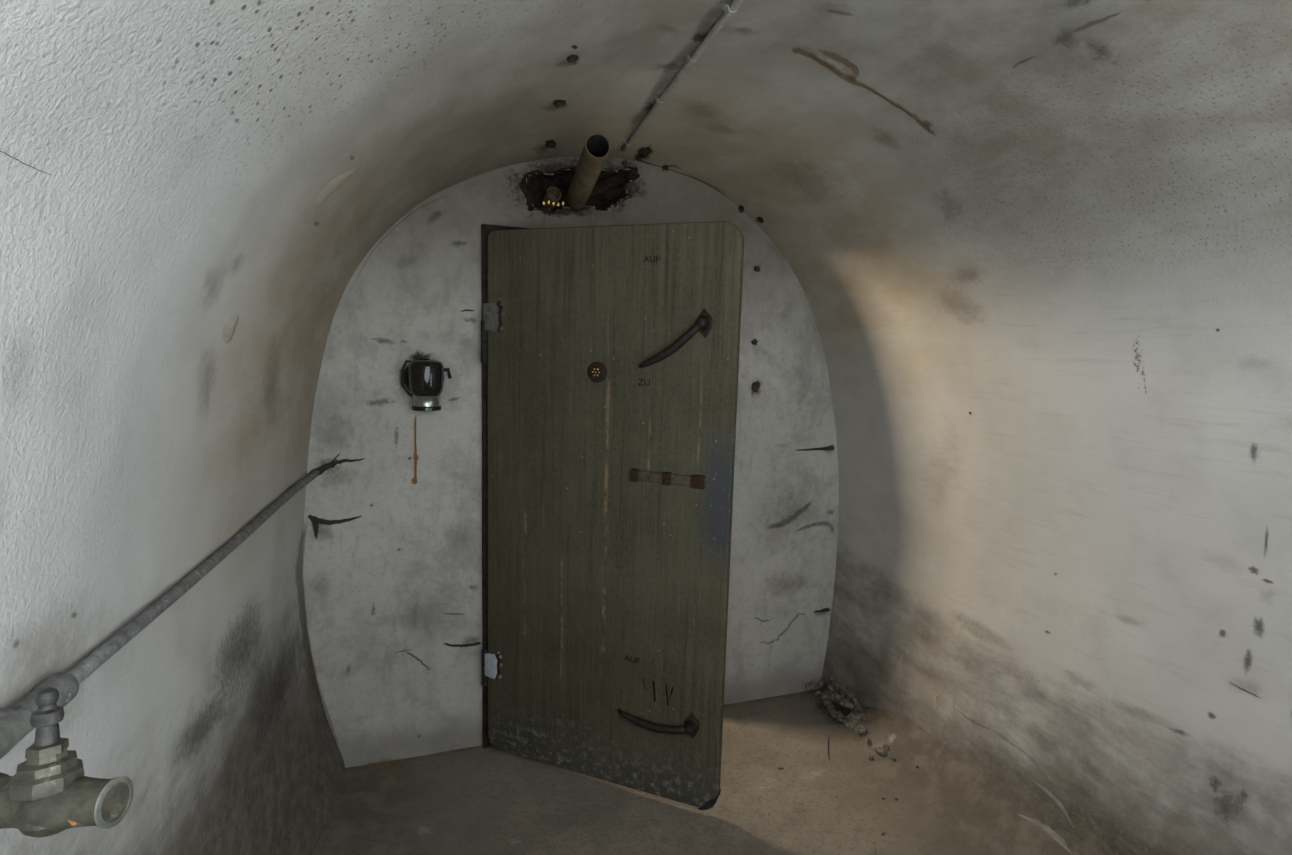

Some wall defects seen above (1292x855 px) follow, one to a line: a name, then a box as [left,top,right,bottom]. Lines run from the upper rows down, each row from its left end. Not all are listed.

crack [794,48,933,134]
spalling [520,144,681,214]
crack [307,454,365,480]
corrosion [408,417,419,484]
crack [308,515,361,538]